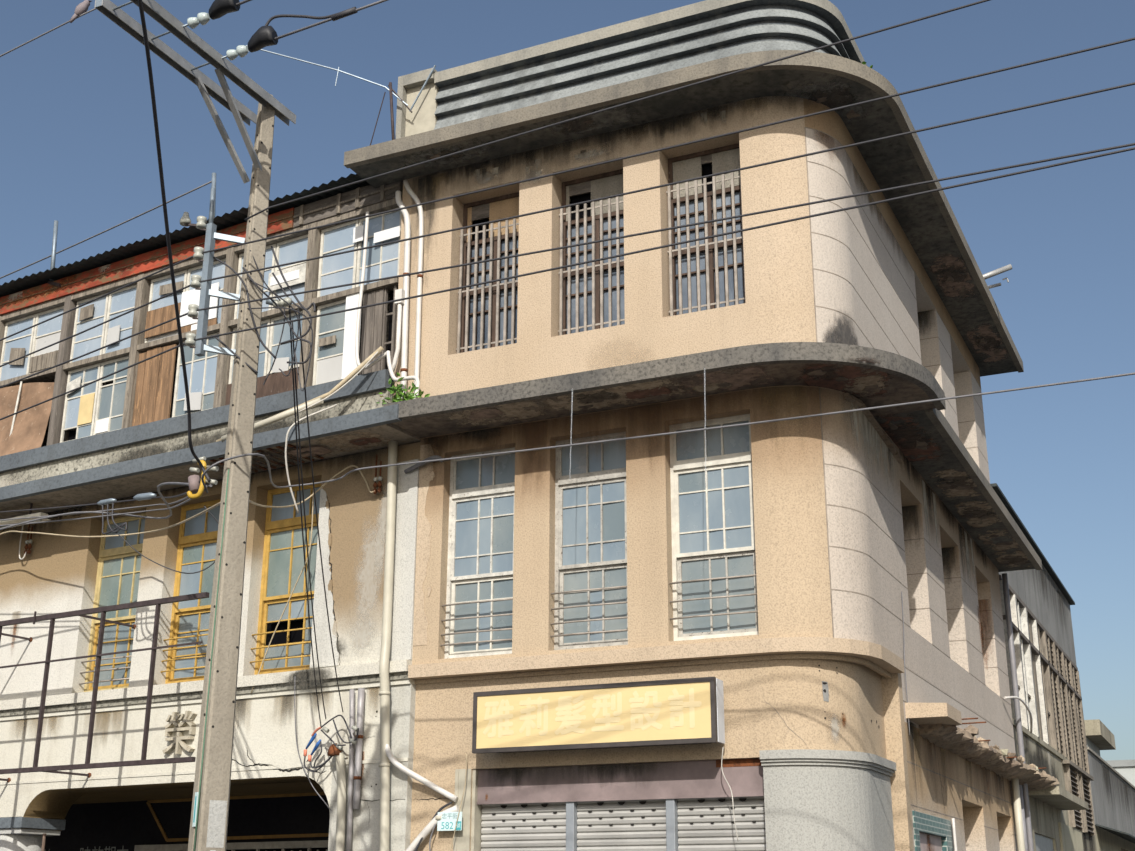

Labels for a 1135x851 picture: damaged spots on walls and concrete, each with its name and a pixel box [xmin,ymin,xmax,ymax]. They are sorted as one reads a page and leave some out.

damp [917,310,931,326]
flaking render [413,444,435,646]
flaking render [310,489,340,668]
damp [286,668,328,699]
crack [232,750,325,774]